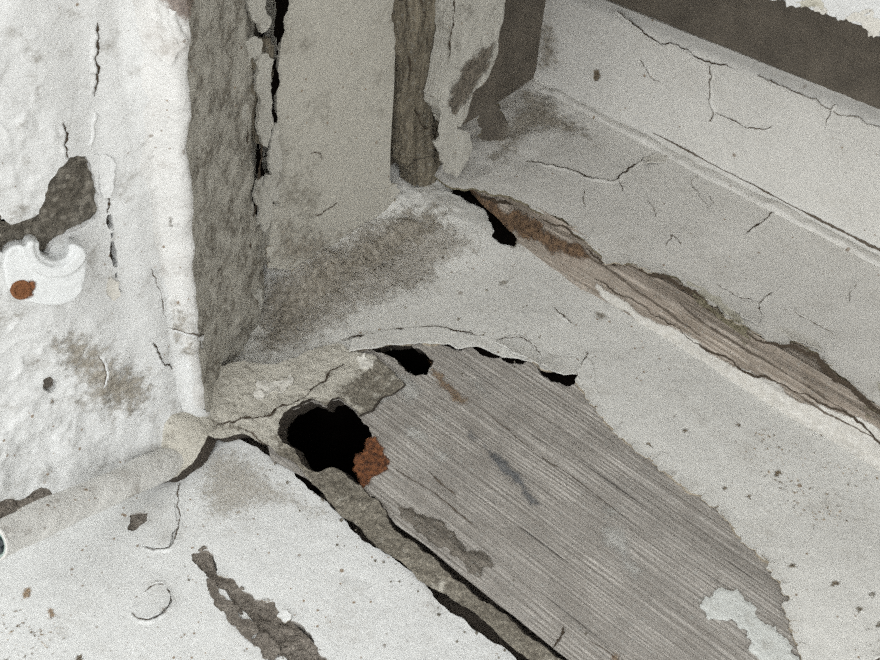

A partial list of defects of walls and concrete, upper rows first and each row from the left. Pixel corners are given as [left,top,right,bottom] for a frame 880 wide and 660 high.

peeling [772,0,880,38]
crack [88,23,100,97]
crack [614,10,773,132]
crack [758,75,880,130]
spalling [0,154,116,252]
peeling [601,250,666,275]
peeling [681,278,834,366]
spalling [0,487,52,519]
corrosion [353,437,390,488]
peeling [268,327,814,660]
crack [130,580,176,625]
spalling [192,545,336,660]